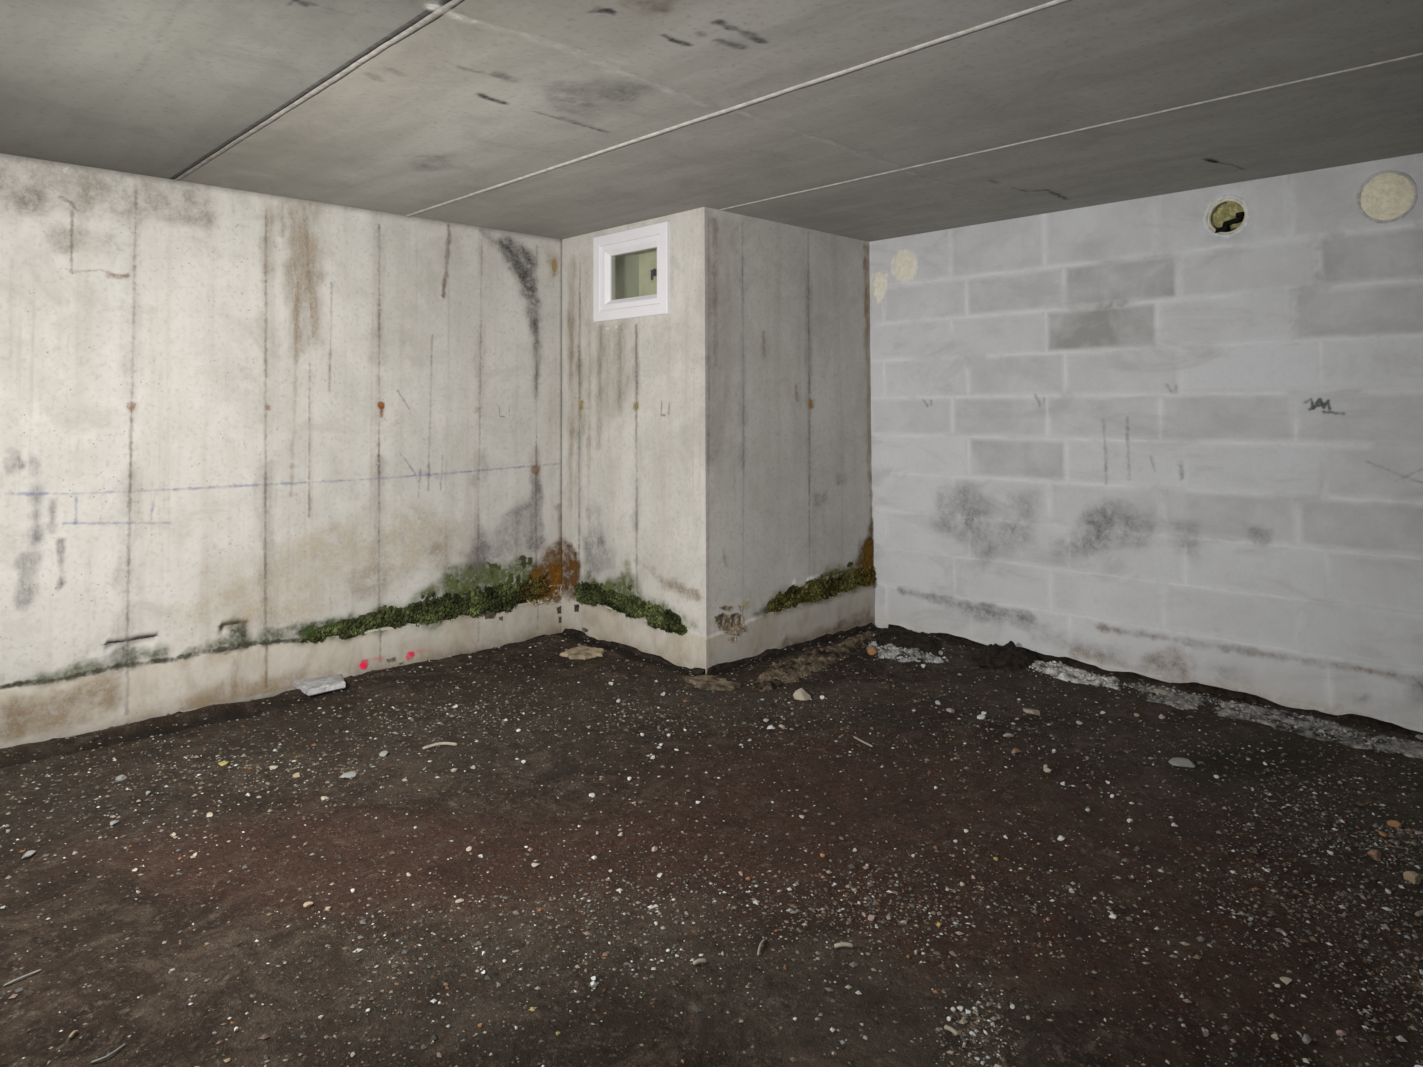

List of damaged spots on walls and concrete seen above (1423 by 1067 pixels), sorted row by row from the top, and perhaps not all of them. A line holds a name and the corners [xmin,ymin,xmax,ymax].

damp [500,239,538,302]
rust [531,541,580,599]